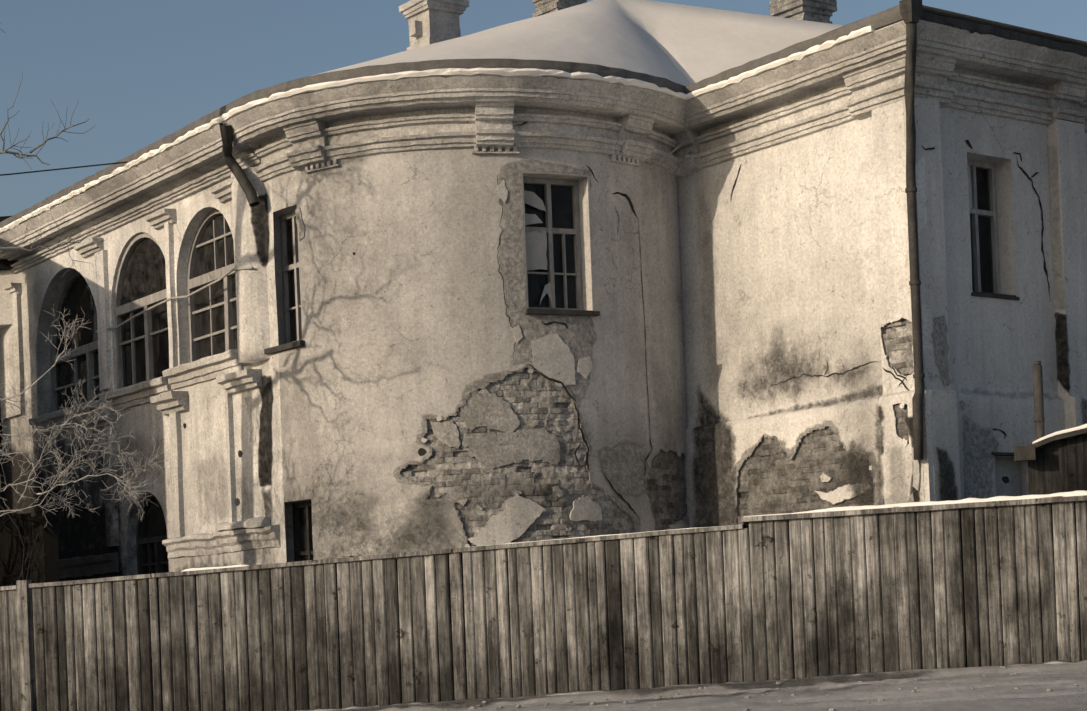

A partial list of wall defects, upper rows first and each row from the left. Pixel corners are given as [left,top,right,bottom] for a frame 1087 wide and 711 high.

water stain [251,193,269,266]
crack [1013,152,1050,297]
water stain [258,376,273,526]
flaking render [331,159,640,559]
flaking render [646,449,690,531]
water stain [692,391,737,528]
flaking render [732,420,879,525]
water stain [740,351,884,506]
crack [769,361,909,391]
flaking render [880,318,914,376]